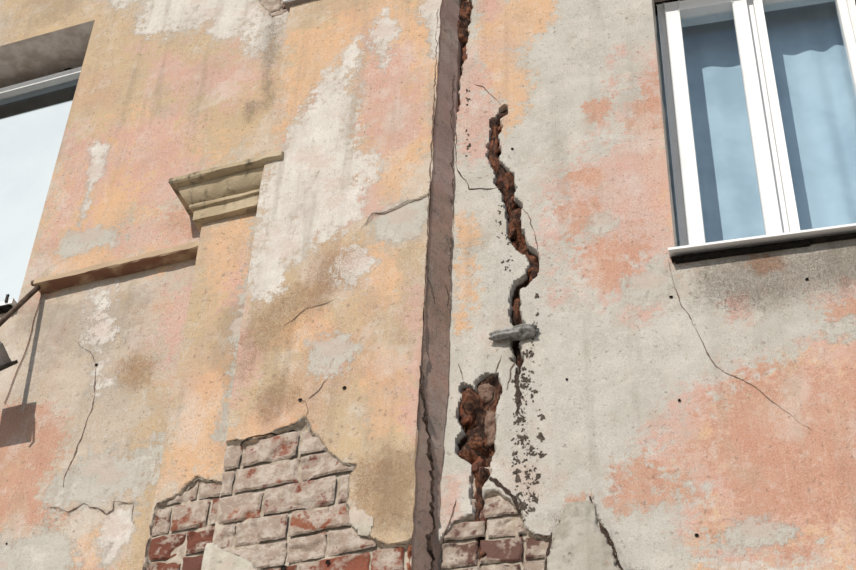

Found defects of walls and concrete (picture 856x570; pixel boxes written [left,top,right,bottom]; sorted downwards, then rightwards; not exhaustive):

peeling [74,0,289,59]
peeling [413,0,442,60]
flaking render [145,6,429,570]
crack [367,0,552,570]
crack [669,264,811,430]
crack [63,343,96,487]
crack [50,501,134,515]
flaking render [441,474,550,570]
crack [589,496,623,570]